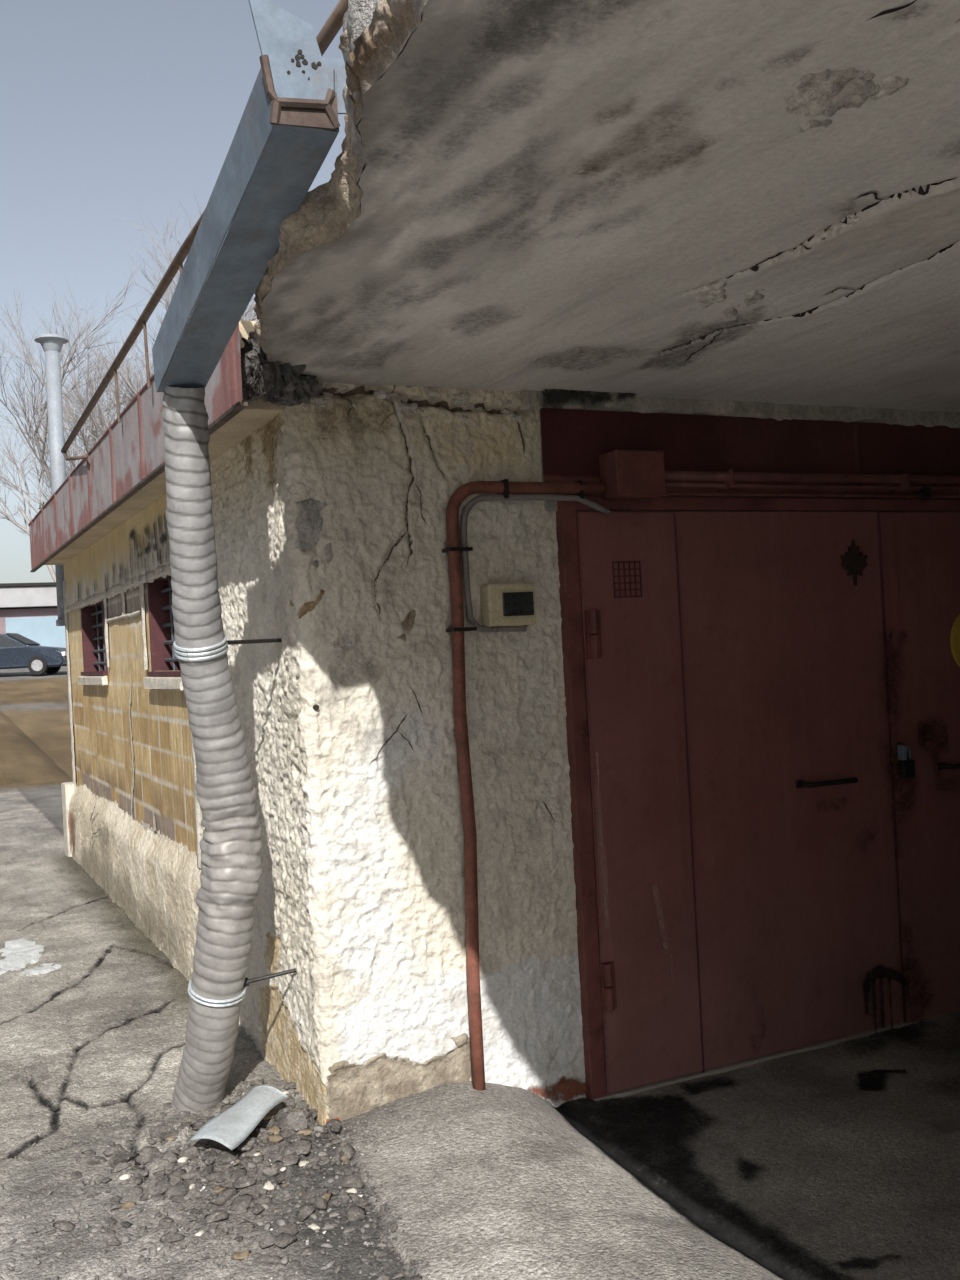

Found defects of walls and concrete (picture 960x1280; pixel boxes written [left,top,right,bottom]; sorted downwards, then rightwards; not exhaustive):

spalling [338,0,398,108]
spalling [783,67,909,133]
crack [681,177,960,295]
crack [663,285,865,362]
leakage [544,389,636,408]
peeling [295,498,333,568]
crack [301,381,525,614]